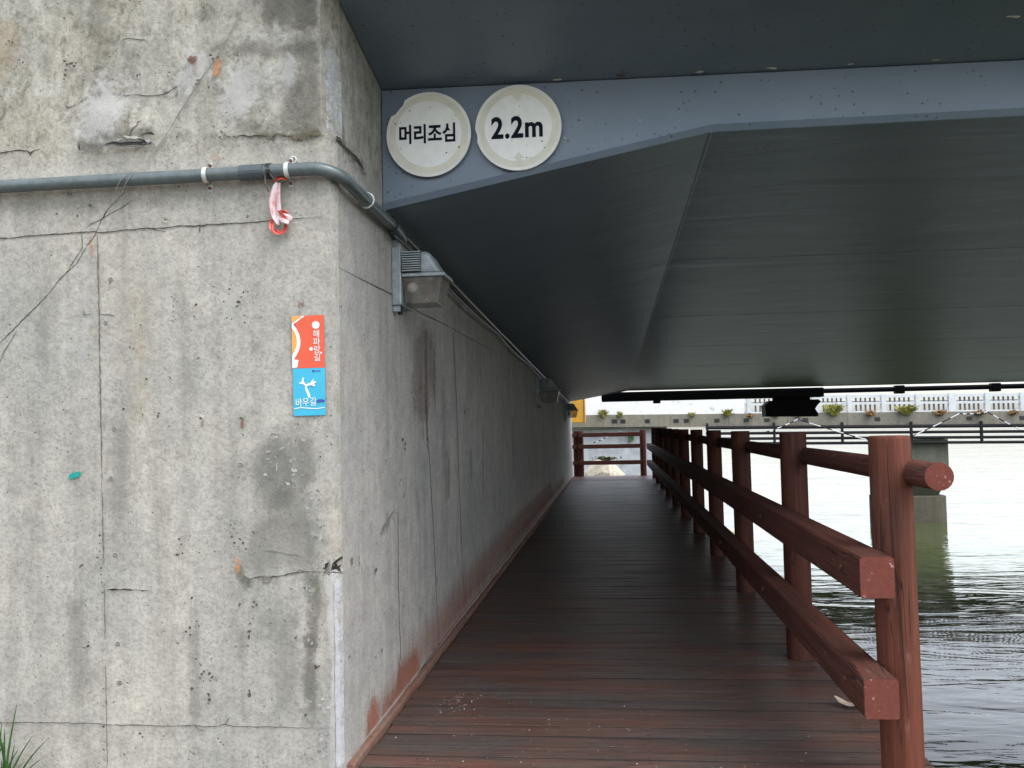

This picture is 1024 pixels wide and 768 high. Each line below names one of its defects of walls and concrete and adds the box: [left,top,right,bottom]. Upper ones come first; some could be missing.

crack [66,74,190,136]
spalling [77,132,155,153]
crack [0,192,309,563]
crack [243,551,320,580]